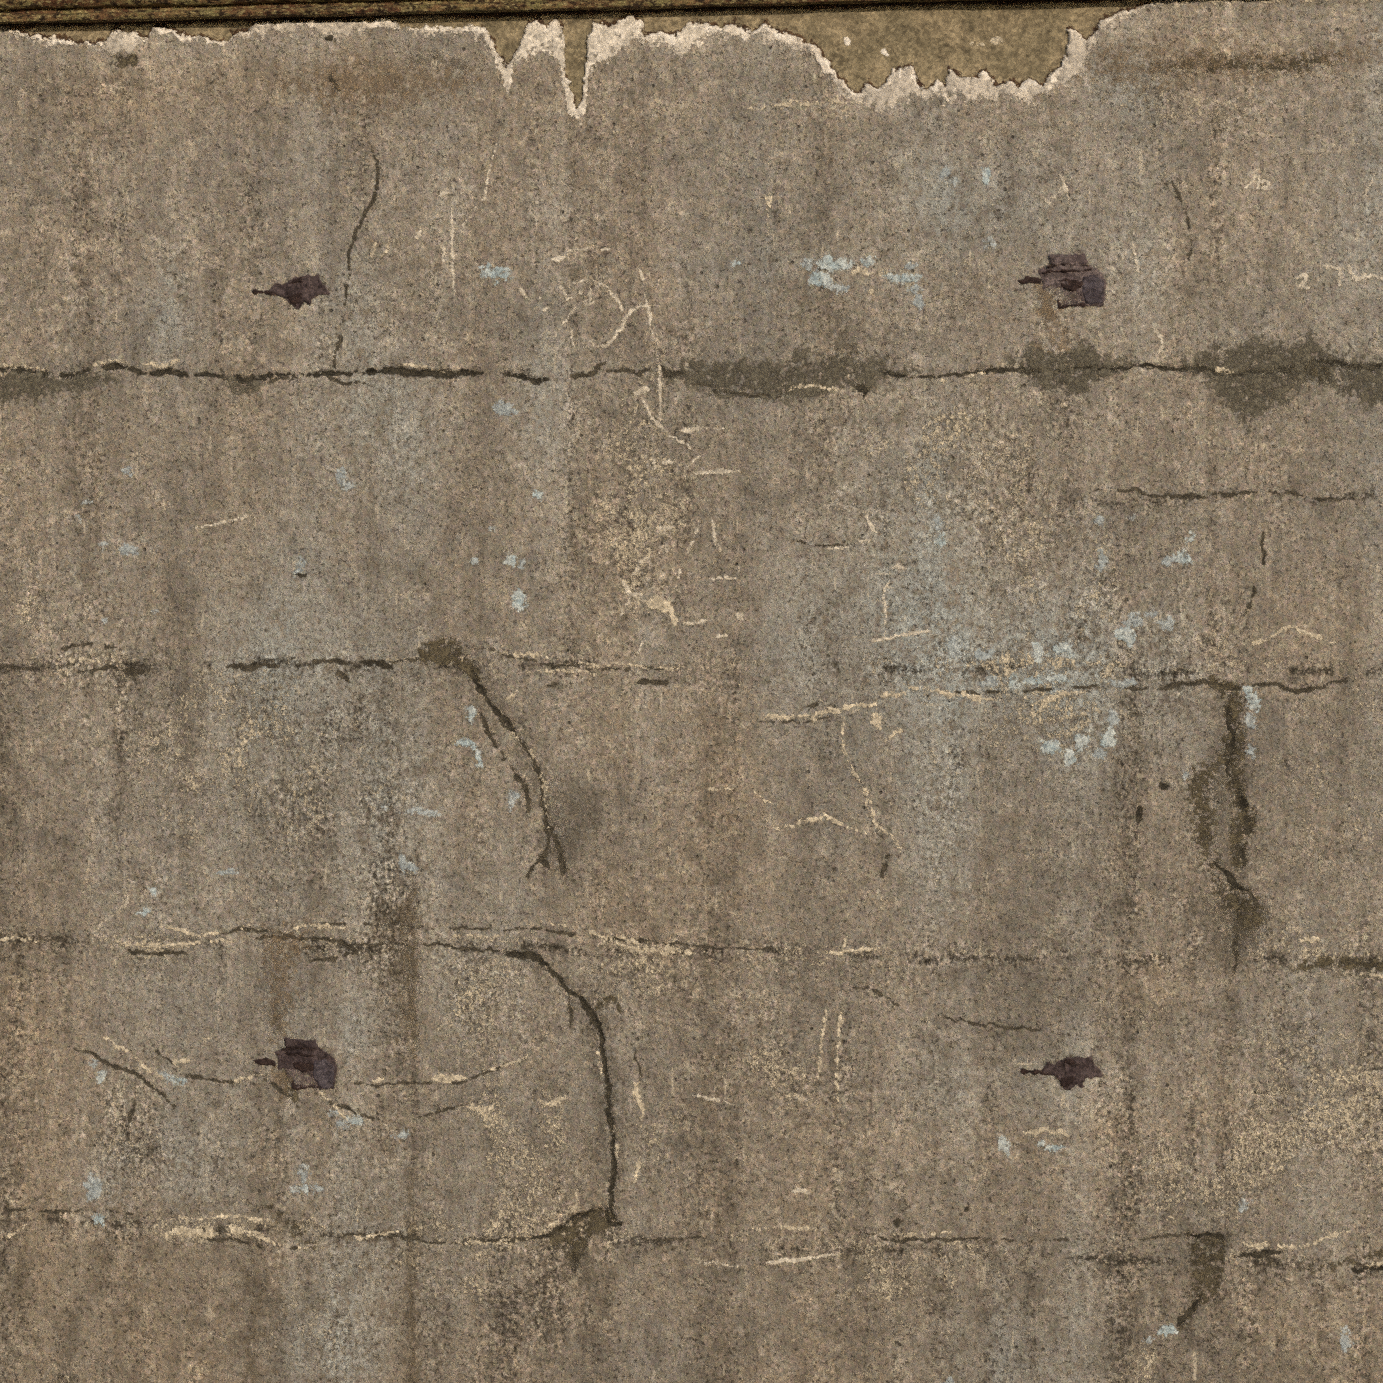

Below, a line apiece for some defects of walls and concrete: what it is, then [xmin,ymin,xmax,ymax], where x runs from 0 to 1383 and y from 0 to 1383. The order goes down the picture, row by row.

spalling [8,0,1281,125]
crack [0,142,1383,400]
leakage [1181,329,1383,432]
crack [0,642,150,677]
crack [226,636,678,880]
crack [696,675,1349,973]
leakage [1183,760,1272,940]
crack [1290,936,1383,978]
crack [19,896,800,1219]
crack [315,1222,531,1245]
crack [740,1206,1123,1245]
crack [1233,1230,1383,1275]